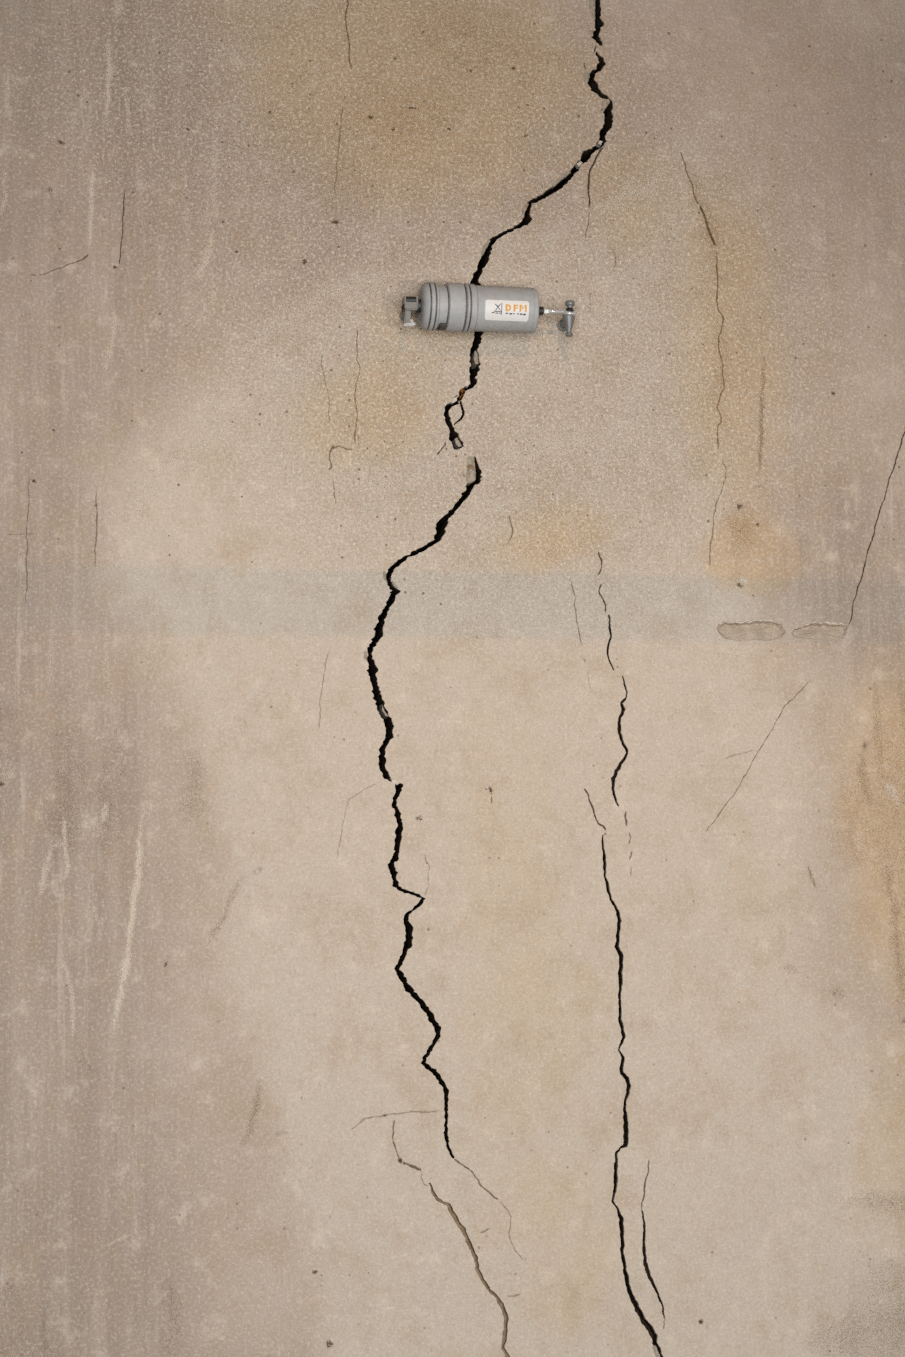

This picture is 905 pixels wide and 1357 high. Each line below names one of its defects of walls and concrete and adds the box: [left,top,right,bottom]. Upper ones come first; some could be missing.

crack [470,0,613,285]
crack [849,432,905,623]
crack [364,331,498,1199]
crack [571,552,665,1357]
crack [384,1115,510,1357]